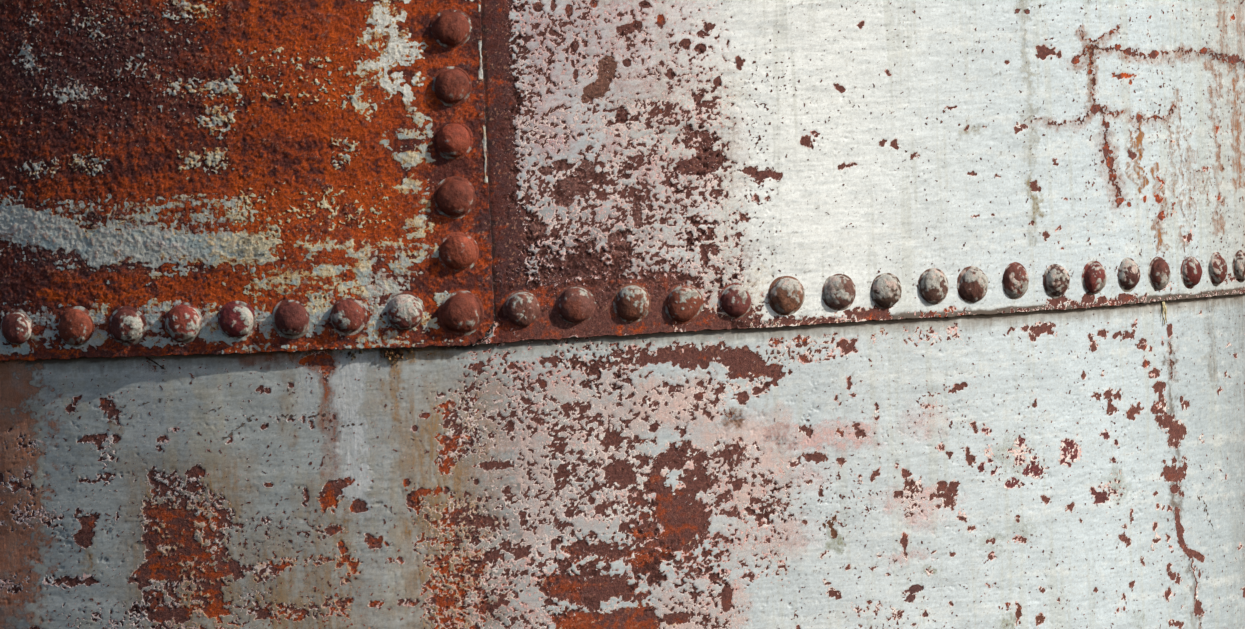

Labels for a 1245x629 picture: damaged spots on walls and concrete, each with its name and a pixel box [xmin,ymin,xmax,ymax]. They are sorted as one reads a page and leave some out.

rust [1127,120,1168,250]
rust [1205,59,1245,189]
peeling [0,0,783,629]
peeling [1007,321,1058,347]
rust [997,273,1245,313]
rust [0,428,67,532]
rust [51,349,496,629]
rust [520,410,808,629]
peeling [823,550,957,629]
peeling [1012,515,1029,545]
peeling [998,601,1046,629]
peeling [1087,318,1205,629]